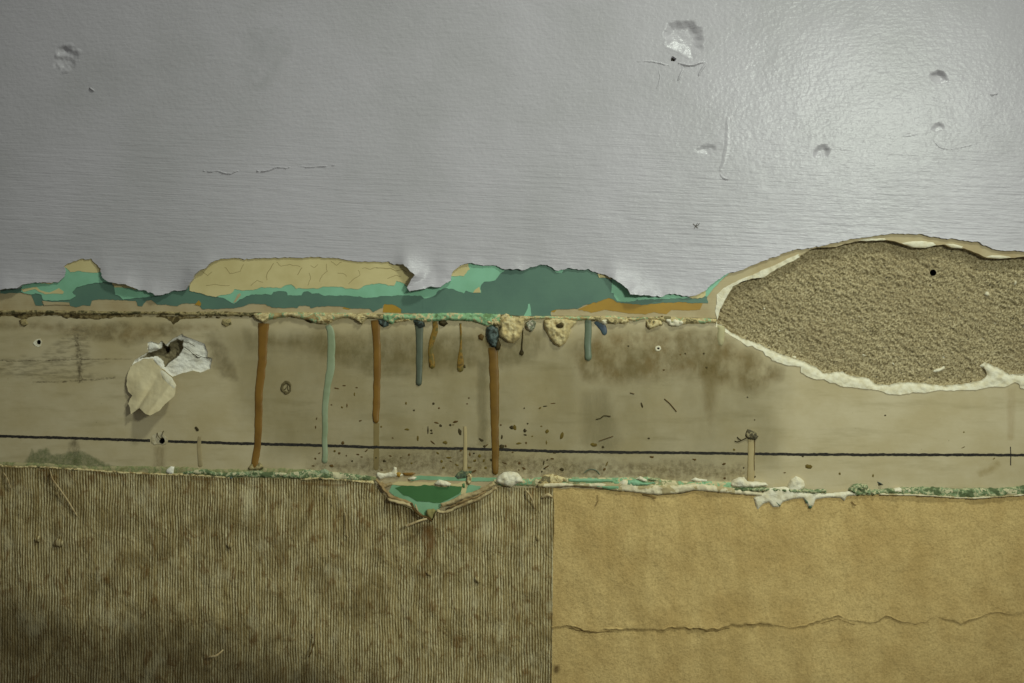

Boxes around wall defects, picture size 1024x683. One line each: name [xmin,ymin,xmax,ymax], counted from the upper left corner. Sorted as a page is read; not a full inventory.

flaking render [0,238,1024,415]